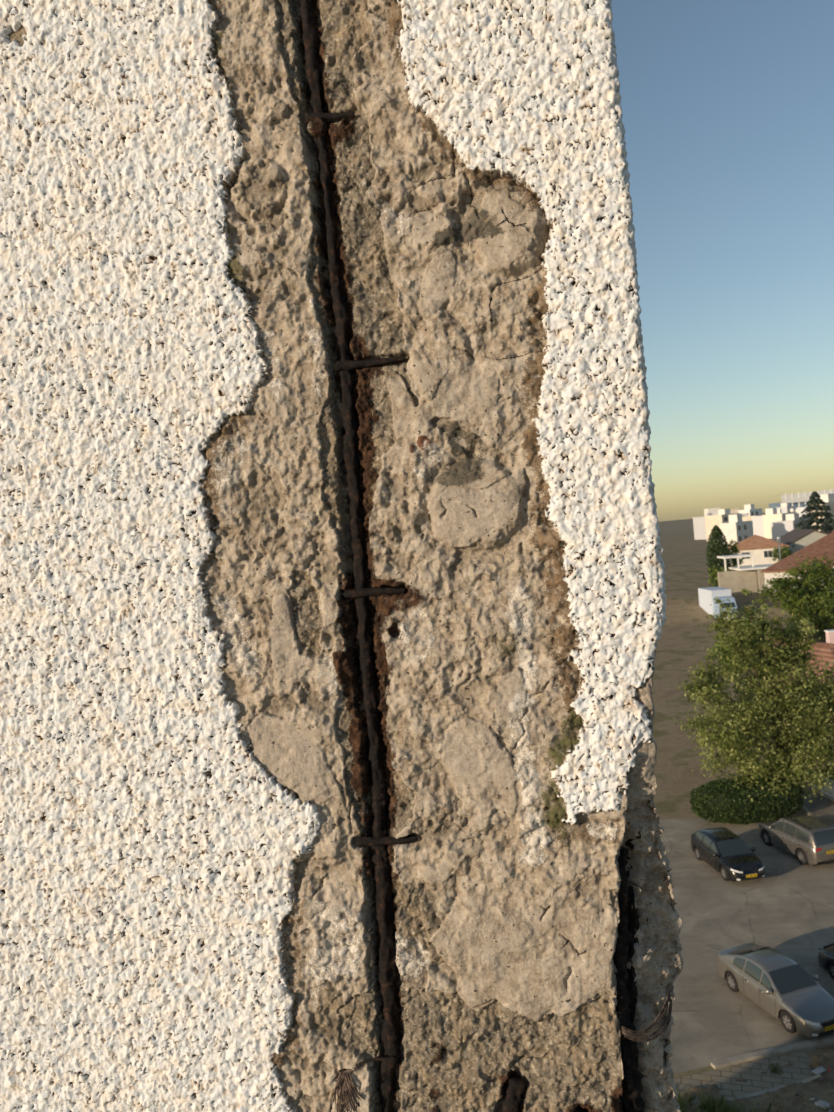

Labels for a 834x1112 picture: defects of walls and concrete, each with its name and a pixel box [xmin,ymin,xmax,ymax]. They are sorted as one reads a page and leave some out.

corrosion [297,0,424,1112]
spalling [201,0,683,1112]
corrosion [488,1070,522,1110]